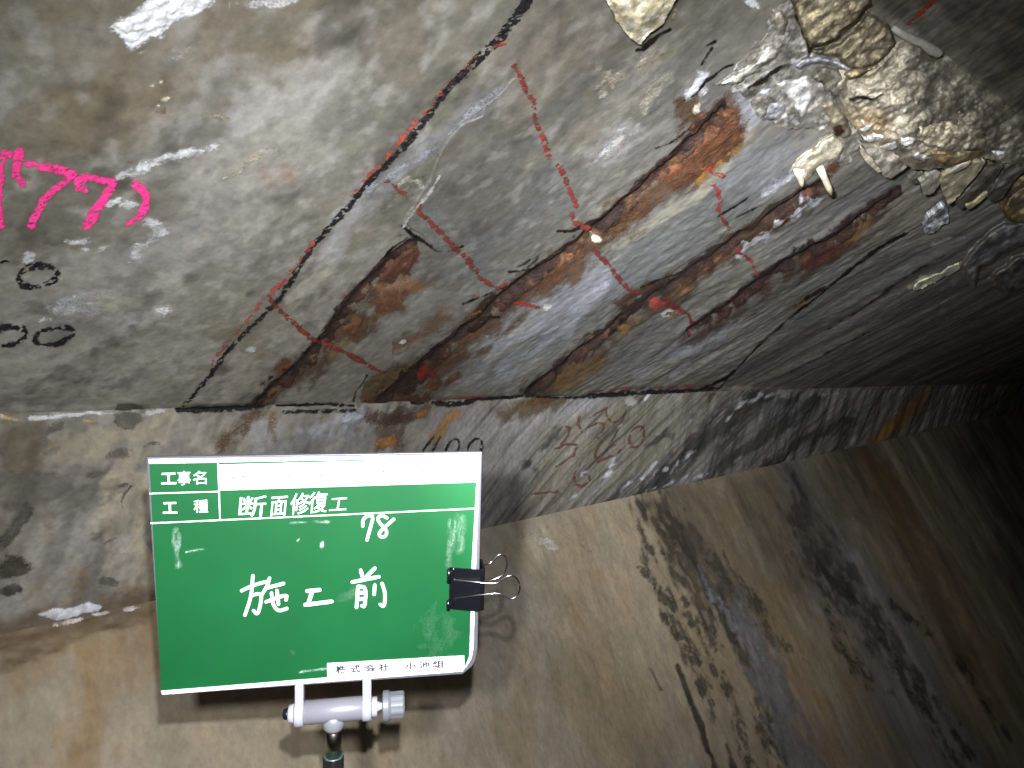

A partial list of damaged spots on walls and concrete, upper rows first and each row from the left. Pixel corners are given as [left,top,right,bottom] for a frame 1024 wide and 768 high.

corrosion [217,269,421,453]
damp [341,413,363,423]
crack [362,225,464,282]
crack [460,292,501,335]
corrosion [357,93,747,450]
crack [557,198,622,233]
corrosion [494,178,829,422]
crack [718,198,756,218]
corrosion [680,210,890,345]
spalling [686,185,902,332]
damp [619,390,856,768]
damp [786,475,976,767]